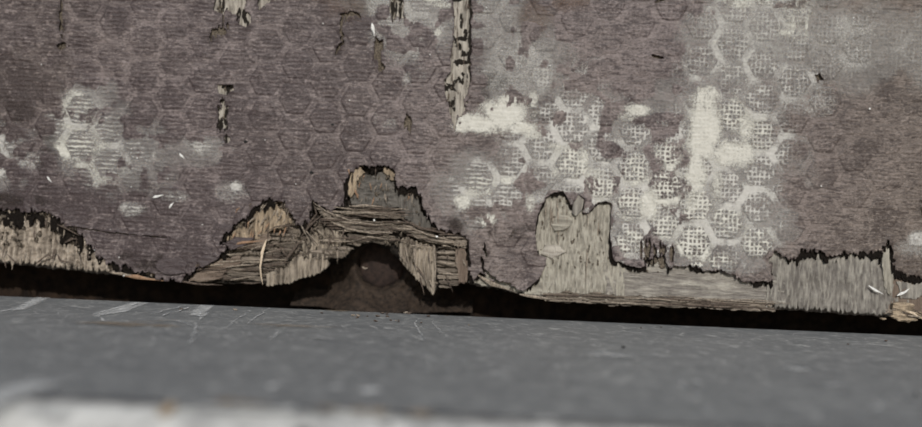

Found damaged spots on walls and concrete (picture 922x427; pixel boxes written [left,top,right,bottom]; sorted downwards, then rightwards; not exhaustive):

peeling [214,0,276,27]
peeling [444,0,473,130]
water stain [49,90,154,186]
crack [217,85,234,143]
water stain [449,0,882,268]
crack [0,210,167,249]
peeling [0,207,174,281]
crack [221,165,463,264]
peeling [348,167,365,198]
peeling [455,248,468,284]
crack [629,239,678,273]
peeling [527,191,922,319]